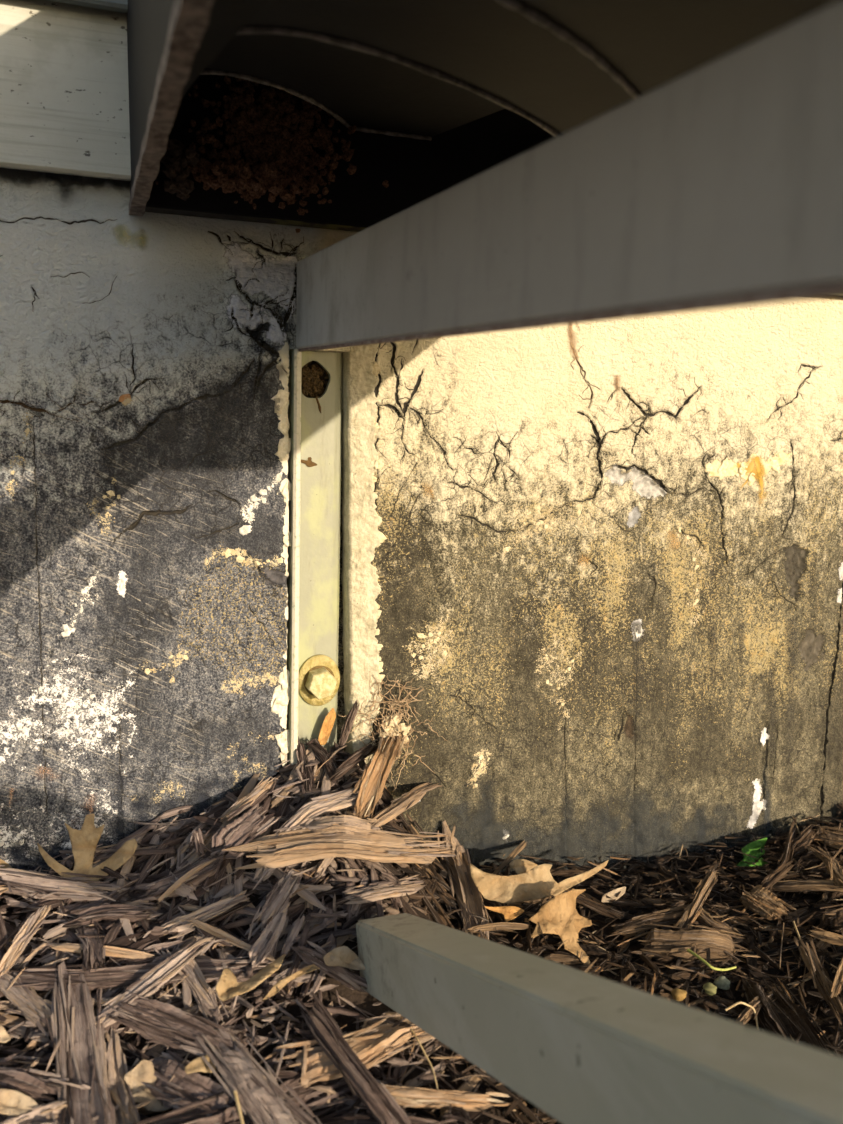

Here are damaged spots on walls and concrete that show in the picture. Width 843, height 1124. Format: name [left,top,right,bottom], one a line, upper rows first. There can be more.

crack [0,217,115,225]
crack [0,231,304,815]
crack [374,340,821,612]
spalling [604,465,667,528]
corrosion [737,456,765,495]
crack [820,580,843,820]
damp [12,838,65,871]
damp [96,772,233,848]
damp [429,785,751,875]
damp [756,779,771,839]